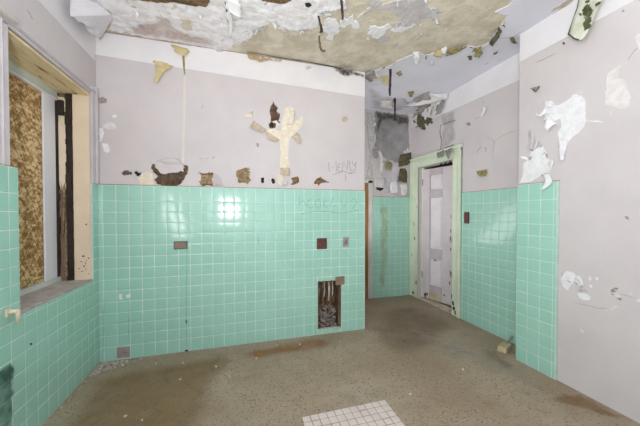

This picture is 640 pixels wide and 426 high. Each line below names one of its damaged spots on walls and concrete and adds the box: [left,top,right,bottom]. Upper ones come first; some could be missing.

spalling [70,0,512,197]
peeling [605,64,631,117]
water stain [367,113,407,177]
peeling [520,92,603,190]
peeling [560,271,598,300]